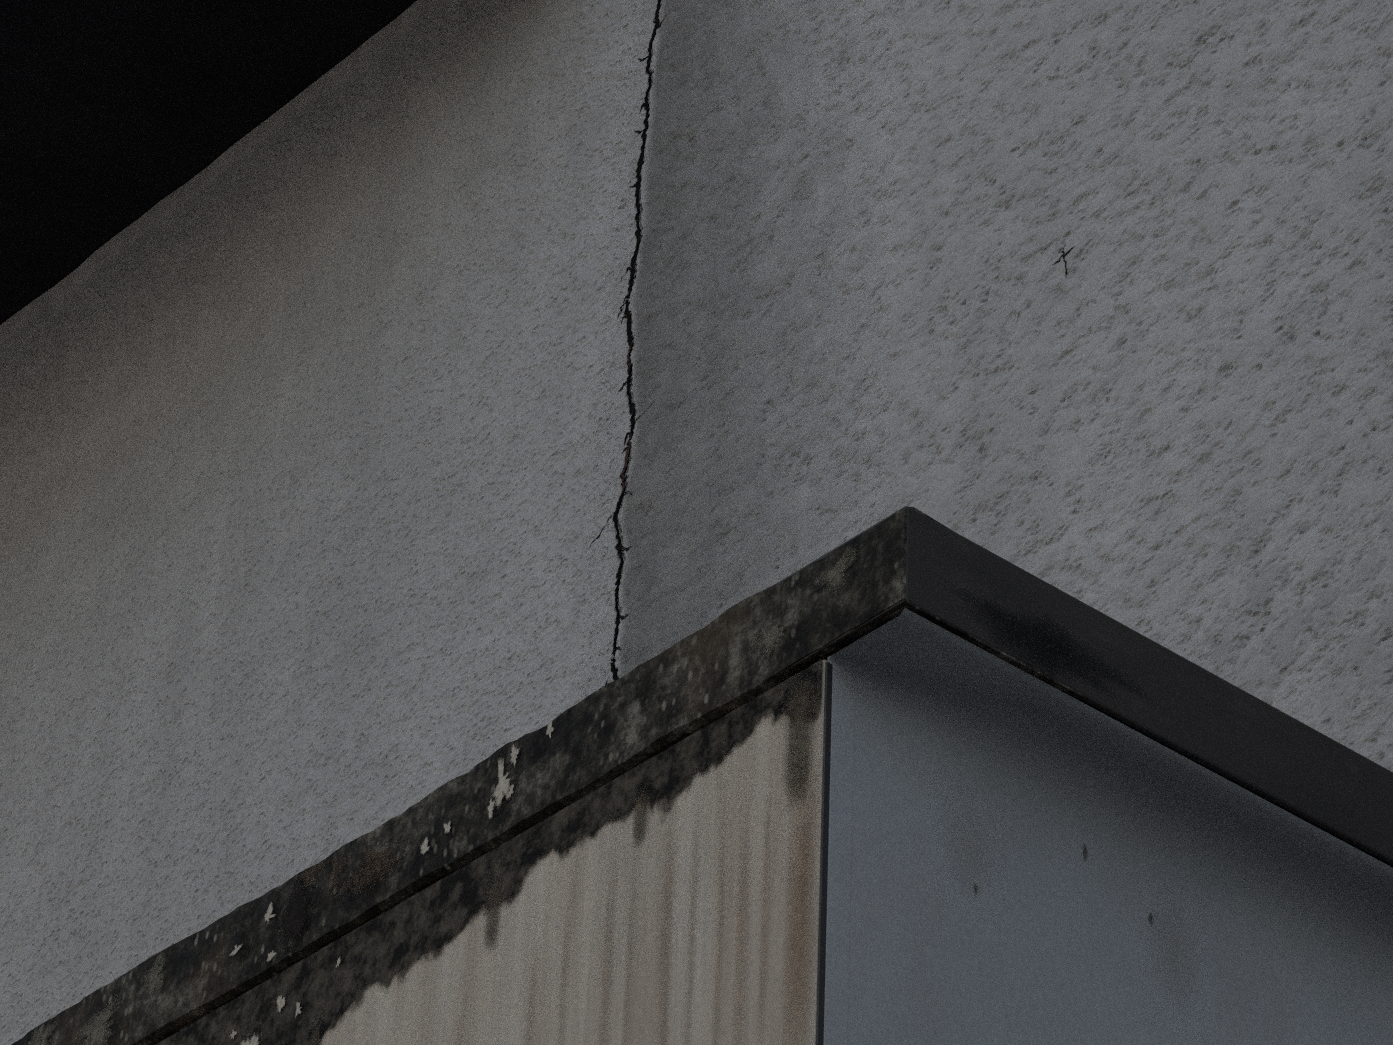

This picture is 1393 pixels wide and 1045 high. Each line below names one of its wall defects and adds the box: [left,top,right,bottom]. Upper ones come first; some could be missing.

crack [589,0,664,685]
damp [156,659,822,1045]